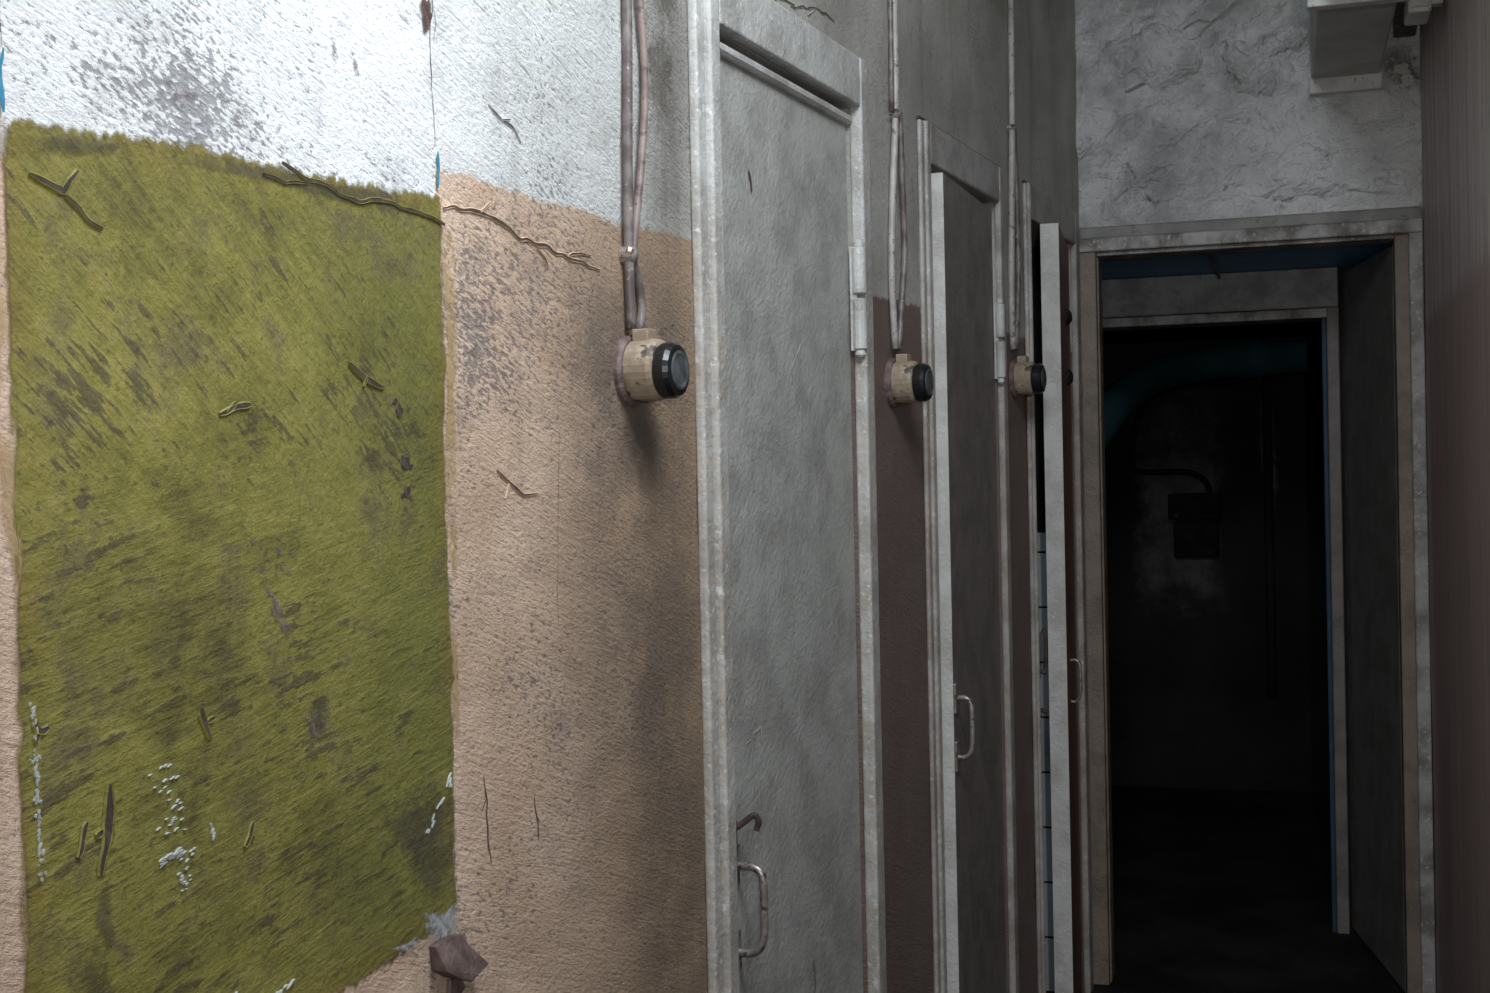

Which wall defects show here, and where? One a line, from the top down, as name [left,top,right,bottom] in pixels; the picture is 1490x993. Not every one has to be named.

corrosion [421,0,432,32]
crack [774,0,835,23]
crack [443,201,600,272]